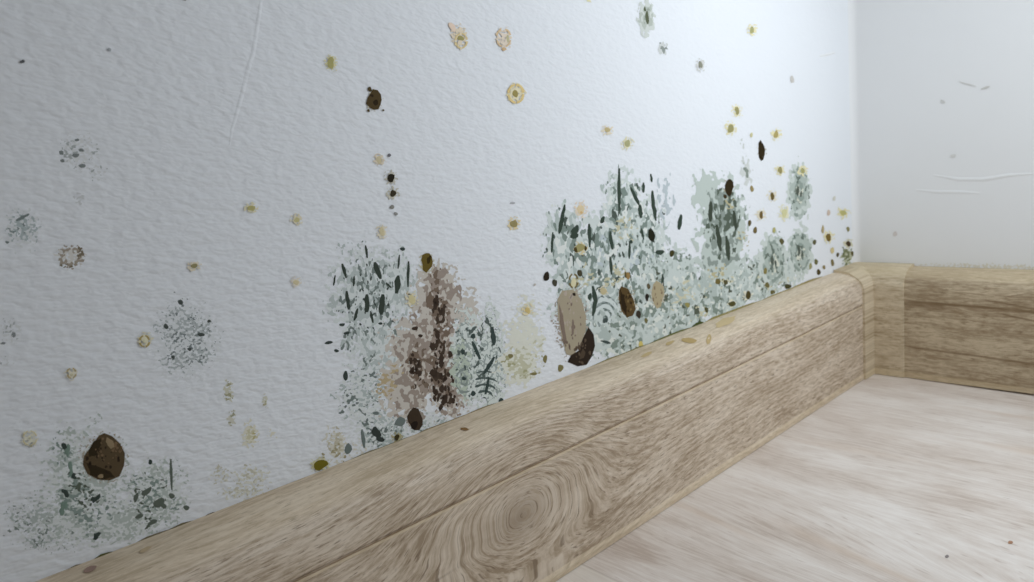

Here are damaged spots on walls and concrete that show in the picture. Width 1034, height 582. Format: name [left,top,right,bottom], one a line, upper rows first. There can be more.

mould [0,204,43,254]
water stain [310,104,853,471]
water stain [145,292,231,390]
water stain [223,379,277,449]
water stain [3,412,192,568]